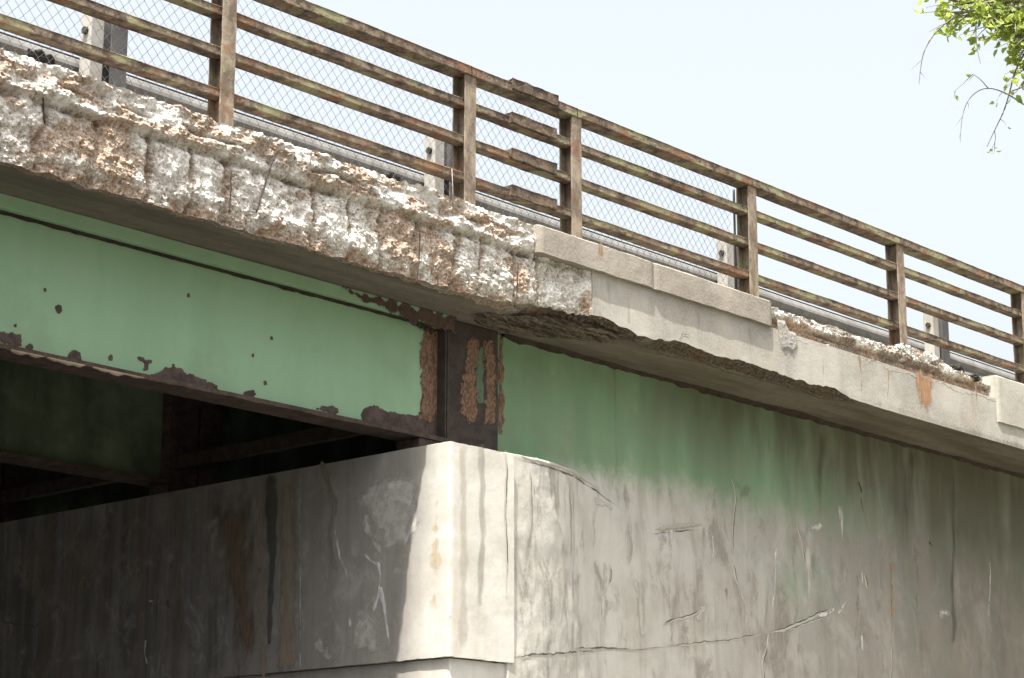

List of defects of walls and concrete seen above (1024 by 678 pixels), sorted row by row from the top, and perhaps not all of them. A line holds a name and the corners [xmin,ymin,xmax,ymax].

rust [0,210,456,429]
spalling [0,48,857,403]
rust [460,336,505,434]
spalling [772,307,993,401]
rust [916,370,932,410]
leakage [223,476,301,678]
crack [515,479,845,678]